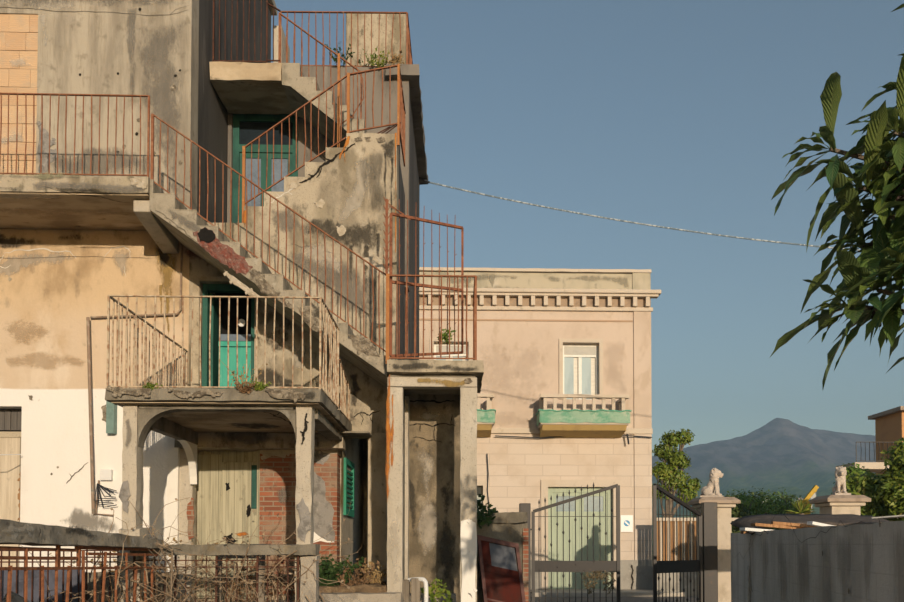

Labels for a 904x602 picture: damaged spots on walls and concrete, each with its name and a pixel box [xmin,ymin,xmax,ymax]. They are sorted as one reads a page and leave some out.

water stain [127,0,179,150]
spalling [36,121,57,173]
water stain [0,234,34,248]
spalling [193,227,323,333]
crack [265,412,309,444]
crack [409,400,455,442]
flaking render [279,450,335,543]
water stain [409,480,455,579]